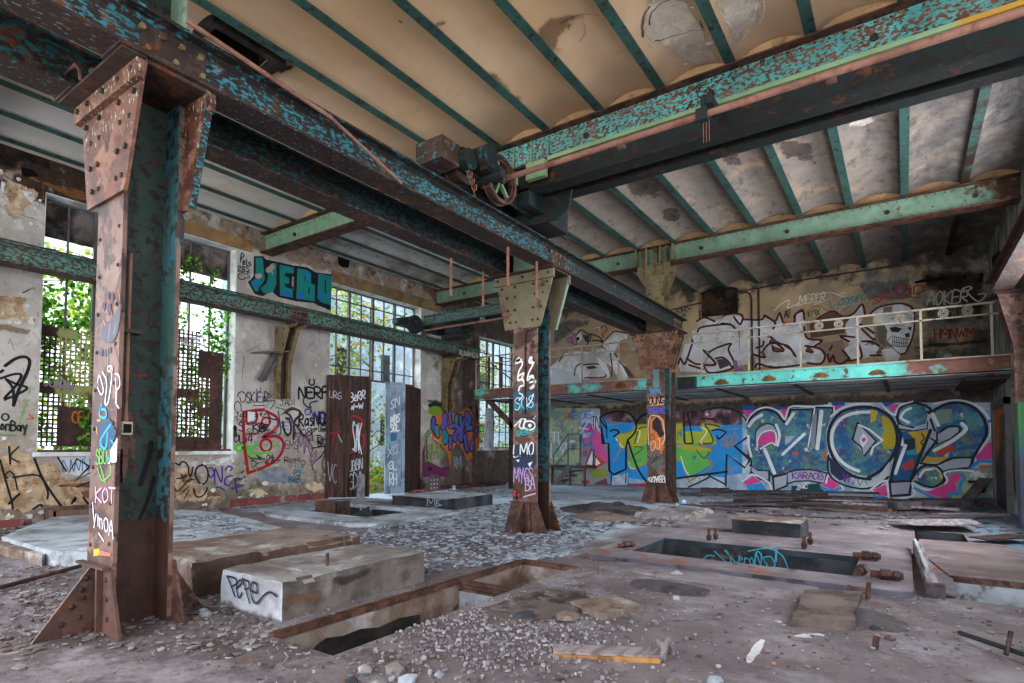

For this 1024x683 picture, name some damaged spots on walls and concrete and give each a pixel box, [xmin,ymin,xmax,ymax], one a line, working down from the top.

flaking render [641,0,717,65]
flaking render [0,169,45,231]